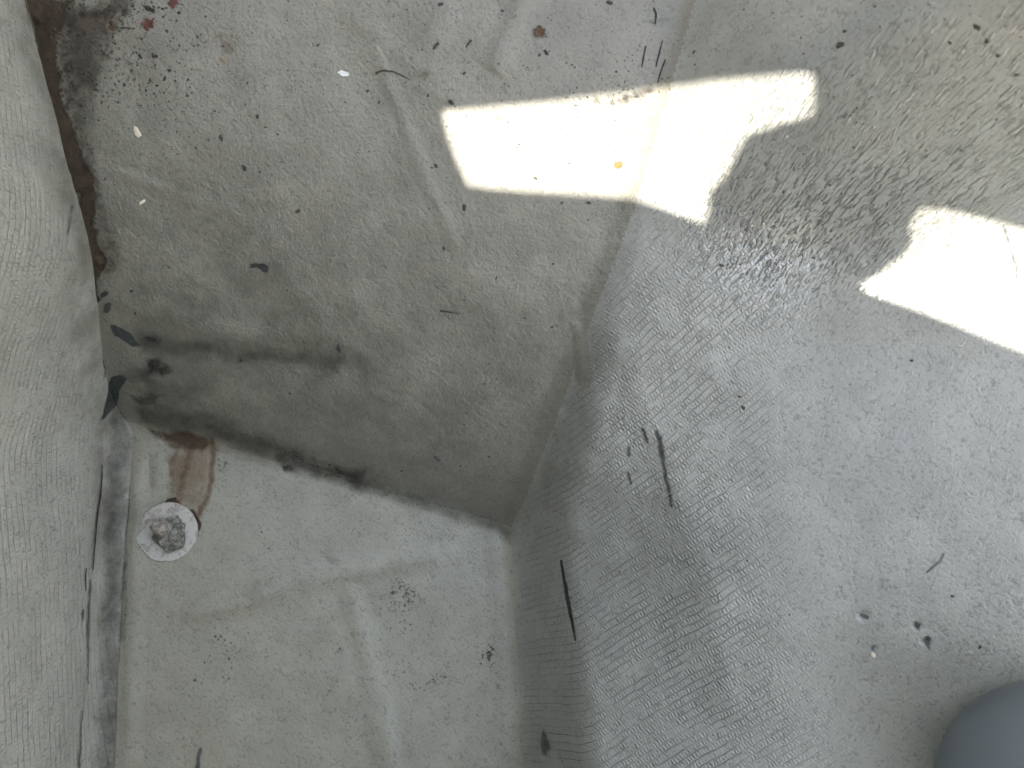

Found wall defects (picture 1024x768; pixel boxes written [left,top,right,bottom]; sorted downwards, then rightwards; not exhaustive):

damp [142,359,170,376]
rust [152,430,214,534]